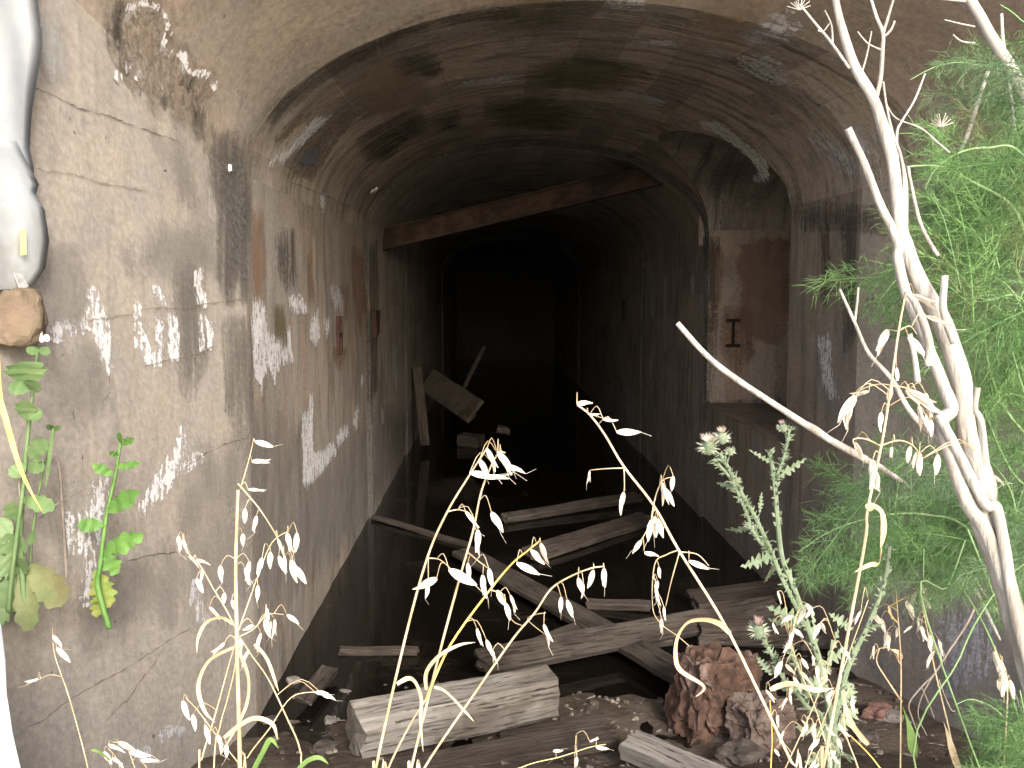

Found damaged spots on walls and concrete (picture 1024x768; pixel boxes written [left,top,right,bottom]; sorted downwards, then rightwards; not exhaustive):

crack [35,88,182,144]
spalling [105,0,239,179]
leakage [210,130,294,409]
leakage [289,285,345,345]